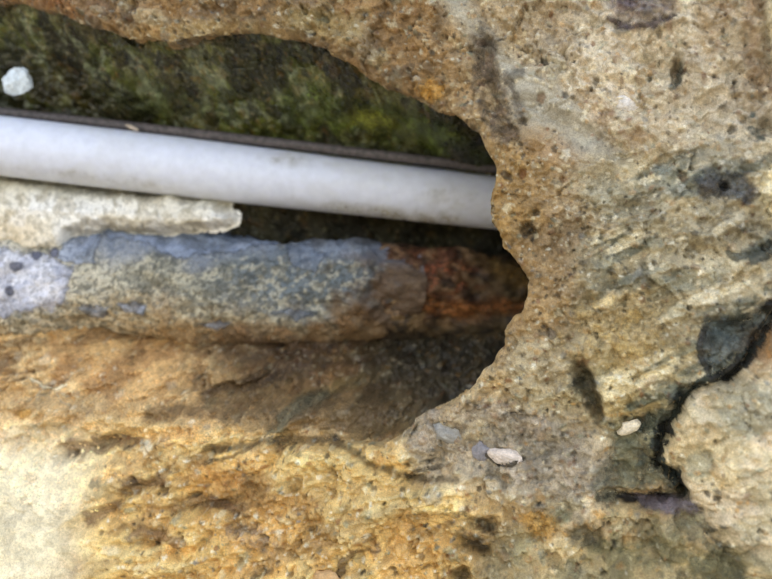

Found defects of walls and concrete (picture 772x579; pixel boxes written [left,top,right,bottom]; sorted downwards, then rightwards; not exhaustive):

spalling [0,4,496,176]
crack [745,113,764,139]
spalling [0,202,512,319]
corrosion [405,247,529,319]
crack [726,241,772,265]
spalling [0,305,616,524]
crack [599,286,772,557]